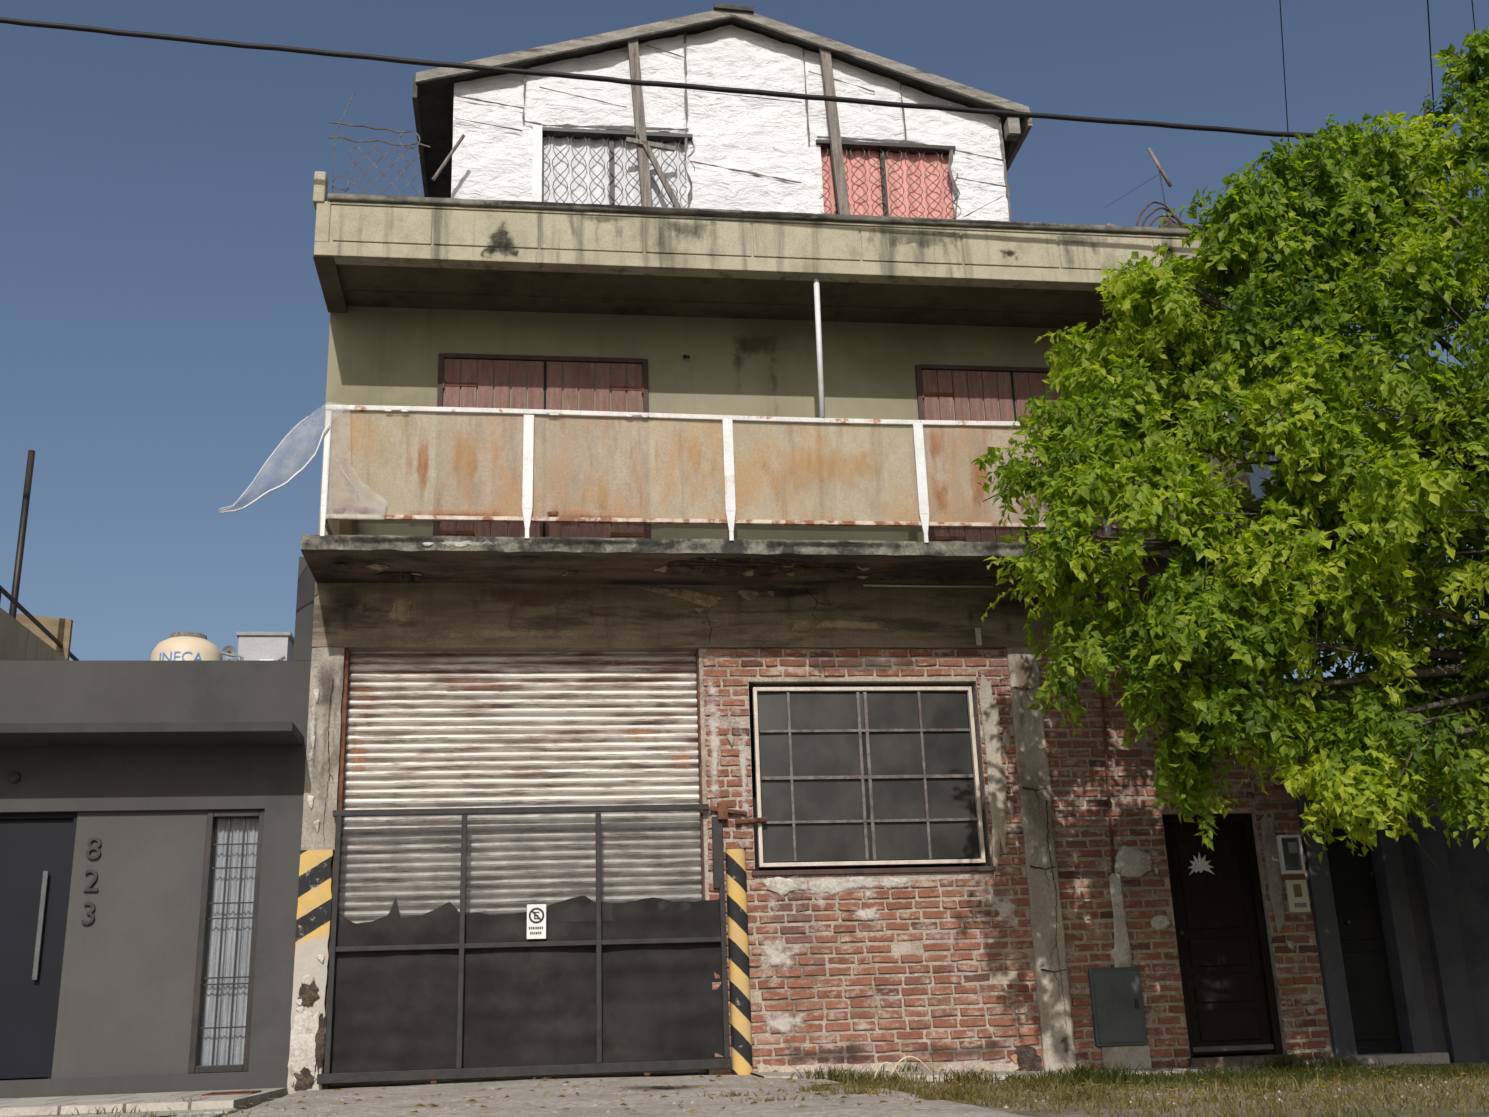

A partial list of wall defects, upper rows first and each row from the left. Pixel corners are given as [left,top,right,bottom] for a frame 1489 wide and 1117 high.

mould [481,226,518,255]
rust [418,446,427,486]
rust [972,461,985,498]
rust [547,486,612,516]
rust [603,660,660,669]
rust [448,680,504,692]
rust [354,687,375,726]
rust [352,748,365,771]
peeling [288,954,325,1091]